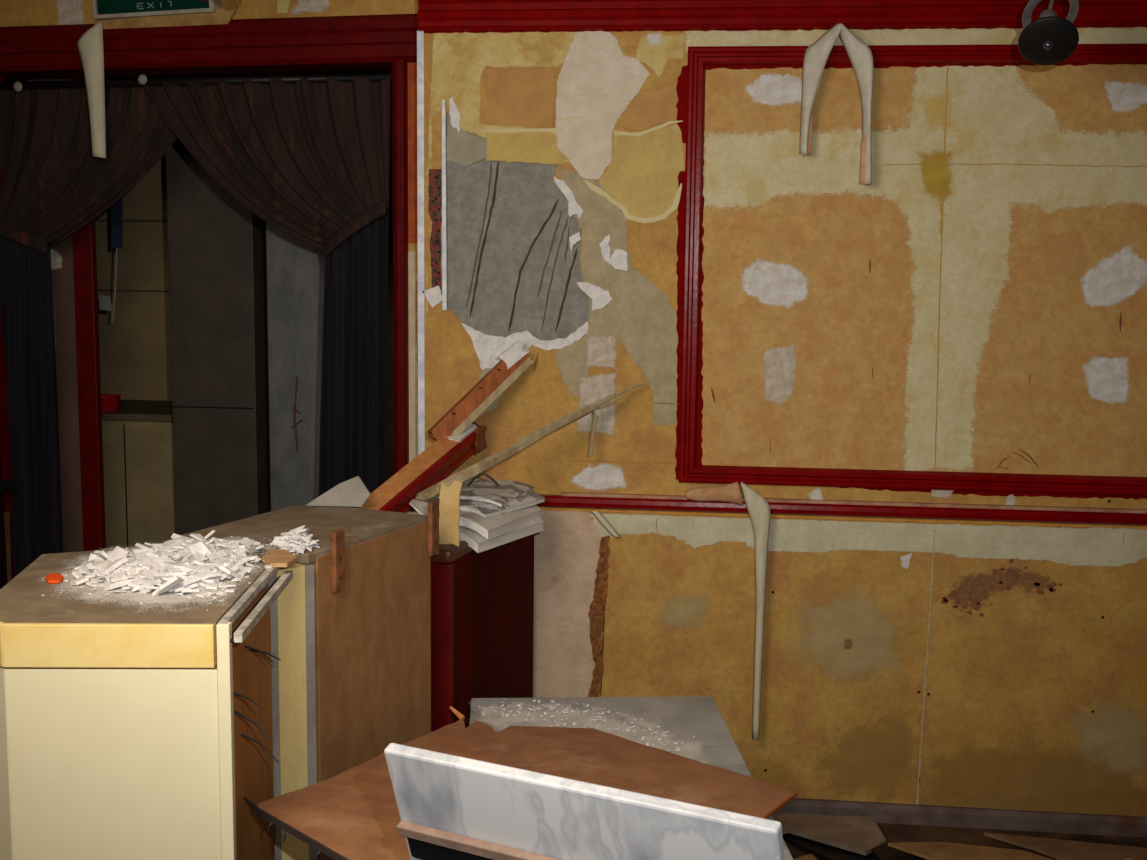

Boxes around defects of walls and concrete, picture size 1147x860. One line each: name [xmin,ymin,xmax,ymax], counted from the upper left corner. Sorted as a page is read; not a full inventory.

spalling [422,31,678,427]
water stain [909,89,963,234]
peeling [533,510,601,698]
water stain [784,579,913,694]